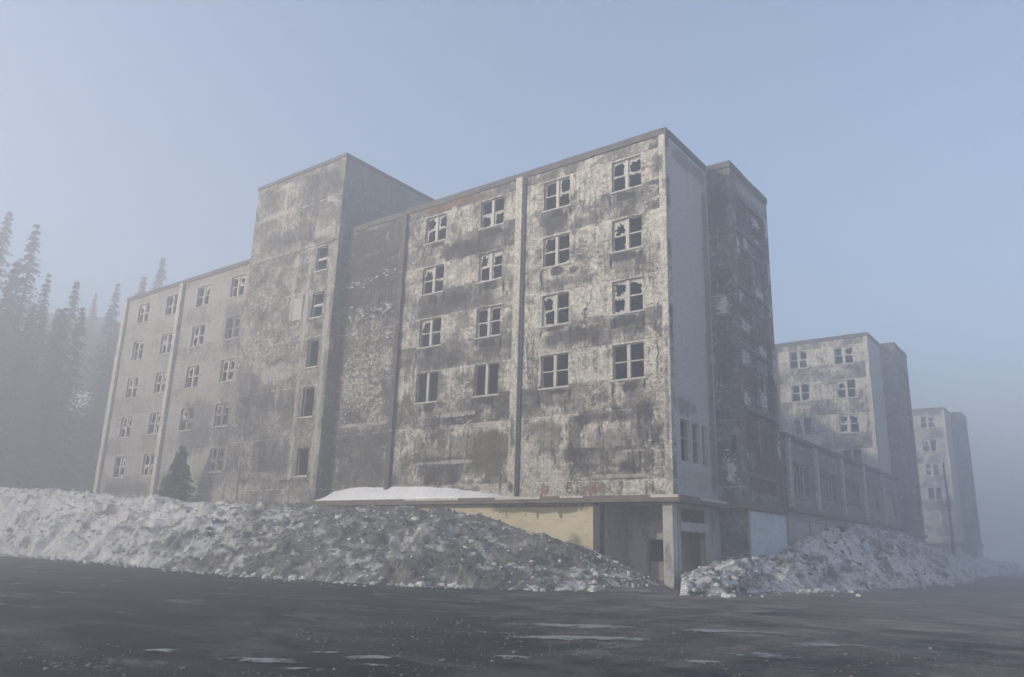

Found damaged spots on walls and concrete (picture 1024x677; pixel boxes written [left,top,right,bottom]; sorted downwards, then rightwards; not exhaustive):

water stain [609,152,664,207]
water stain [261,255,312,491]
water stain [309,266,333,489]
peeling [337,301,397,423]
water stain [413,397,494,426]
water stain [539,265,577,288]
water stain [569,401,664,479]
water stain [609,249,645,268]
water stain [611,312,645,330]
water stain [612,380,645,397]
crack [654,300,676,367]
peeling [713,264,773,334]